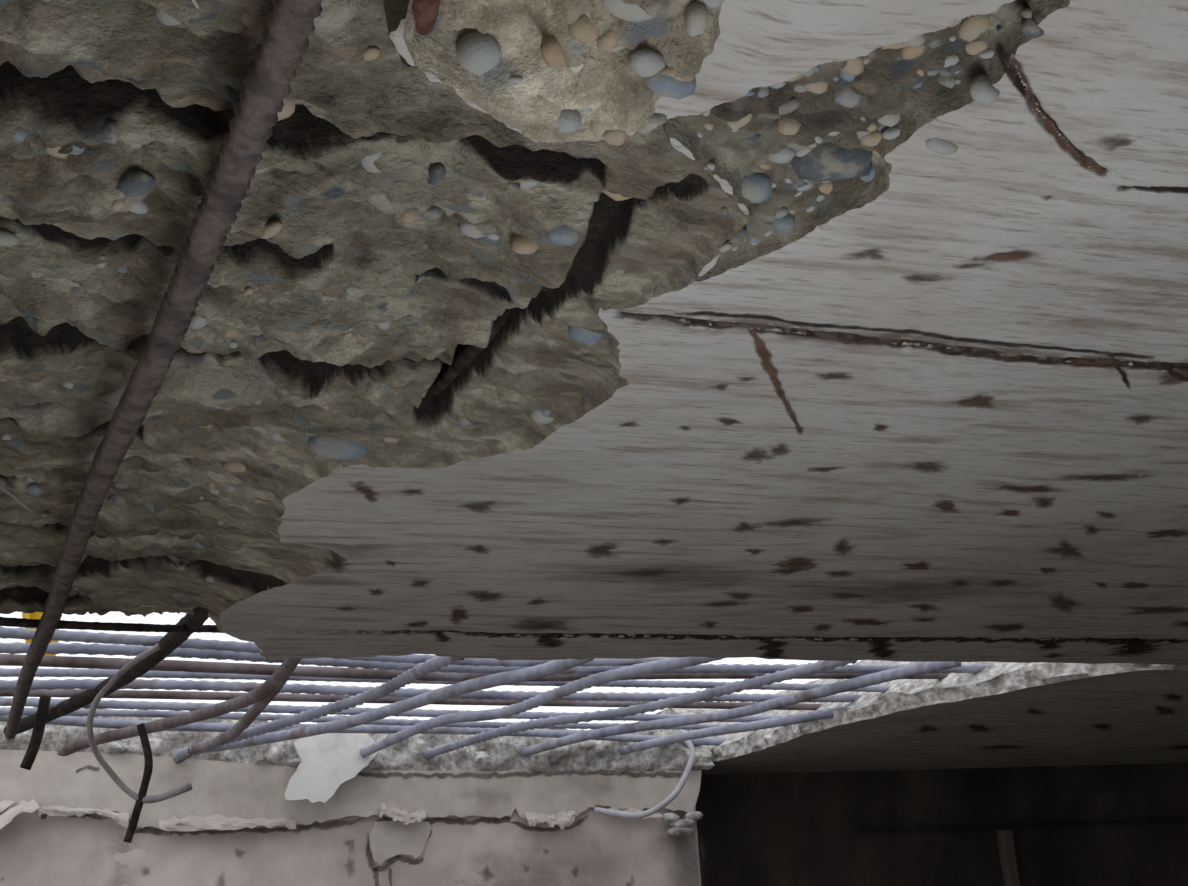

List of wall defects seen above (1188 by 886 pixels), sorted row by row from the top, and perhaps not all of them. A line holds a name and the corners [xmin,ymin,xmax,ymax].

spalling [664,0,1070,281]
crack [997,45,1188,194]
spalling [0,0,752,831]
spalling [743,446,789,461]
corrosion [749,323,803,434]
crack [620,311,1188,387]
spalling [958,396,993,408]
spalling [1000,486,1053,508]
spalling [775,558,815,574]
crack [367,630,1188,658]
flaking render [56,620,1188,865]
crack [41,812,584,886]